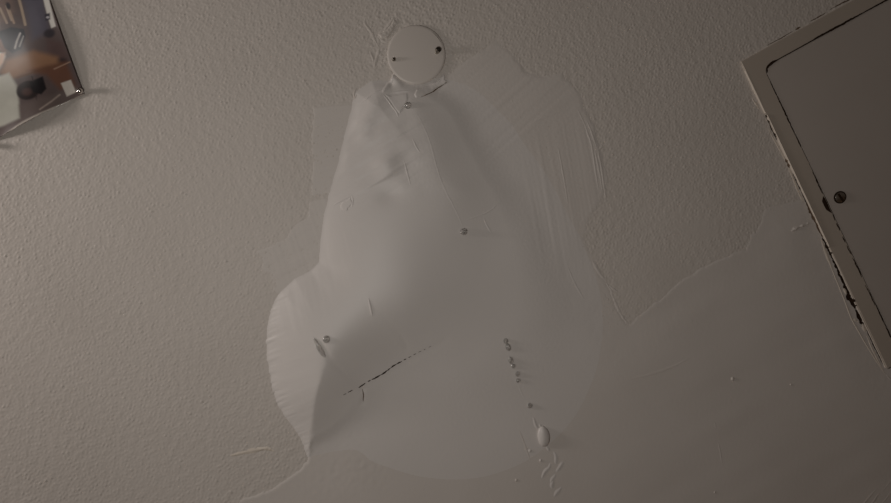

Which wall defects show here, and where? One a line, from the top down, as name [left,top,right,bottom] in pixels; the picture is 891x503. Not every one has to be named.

crack [344,346,431,400]
crack [742,0,891,375]